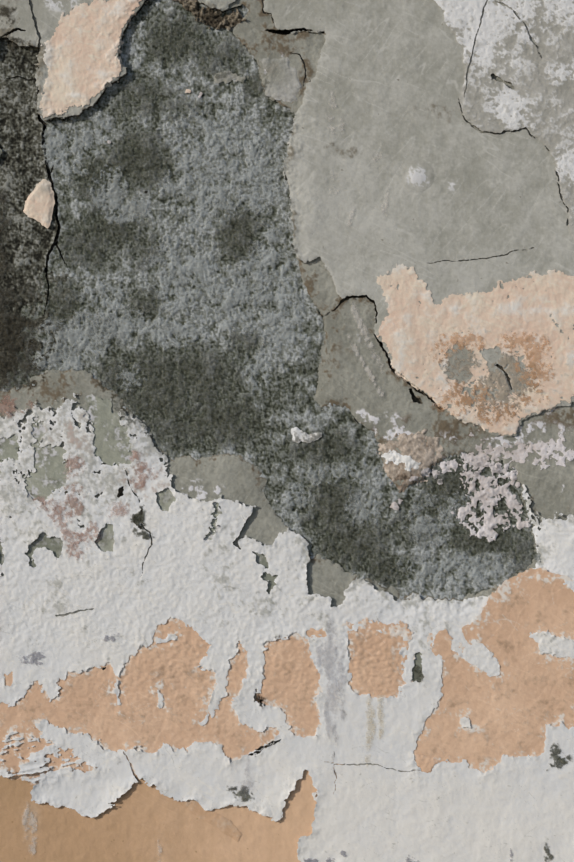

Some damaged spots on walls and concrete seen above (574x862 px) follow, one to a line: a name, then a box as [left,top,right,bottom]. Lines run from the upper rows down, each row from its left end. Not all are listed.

crack [0,0,149,314]
damp [41,117,111,180]
damp [90,165,148,223]
damp [161,109,285,229]
damp [0,192,304,416]
spalling [0,0,574,600]
damp [35,486,100,558]
damp [115,504,152,540]
damp [397,552,515,585]
peeling [342,617,424,698]
peeling [413,568,574,775]
peeling [0,617,327,862]